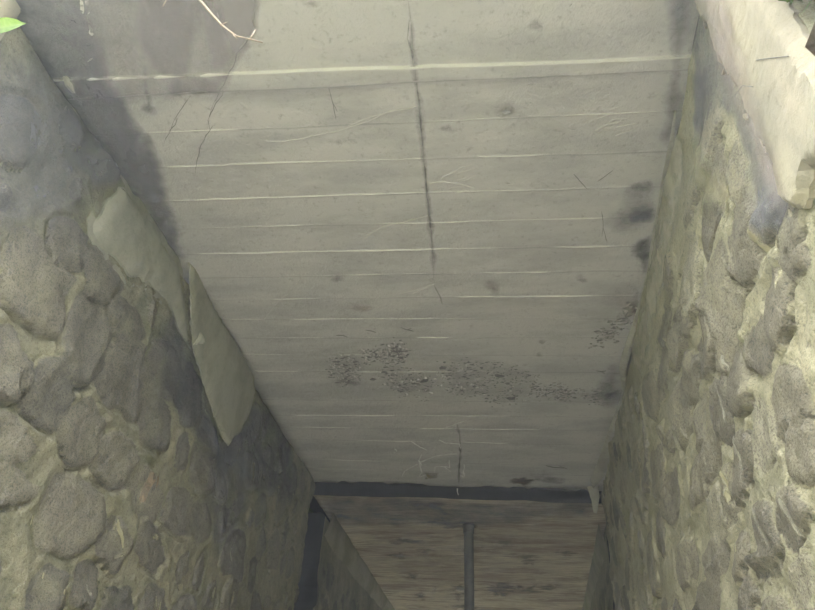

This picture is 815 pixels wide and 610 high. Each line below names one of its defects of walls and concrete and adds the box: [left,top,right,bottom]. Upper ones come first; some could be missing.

water stain [0,0,162,216]
crack [195,13,255,173]
water stain [203,0,255,59]